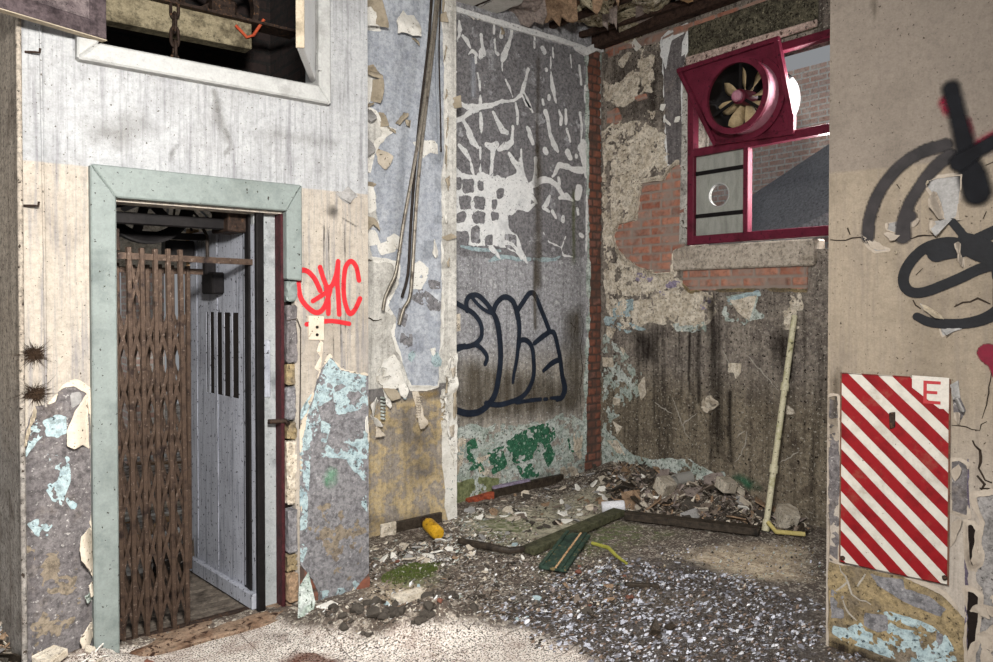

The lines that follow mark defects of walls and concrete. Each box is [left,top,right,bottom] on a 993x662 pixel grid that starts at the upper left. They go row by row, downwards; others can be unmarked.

peeling [24,379,93,662]
peeling [284,0,809,618]
damp [688,298,731,454]
damp [774,338,788,359]
peeling [827,393,993,662]
crack [962,559,970,646]
crack [951,374,992,520]